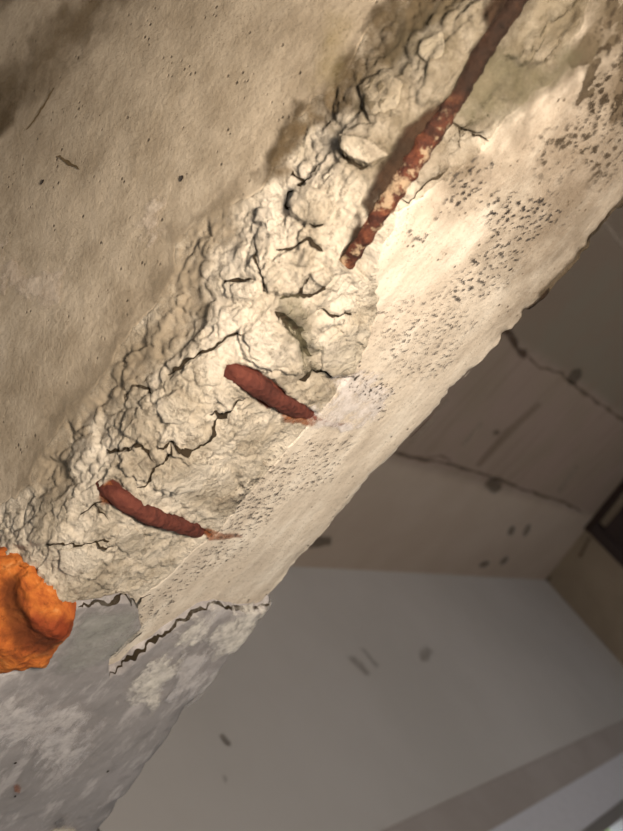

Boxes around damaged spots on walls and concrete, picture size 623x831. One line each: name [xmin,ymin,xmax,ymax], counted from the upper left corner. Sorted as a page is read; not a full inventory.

water stain [266,0,491,182]
corrosion [342,100,446,257]
corrosion [472,0,507,52]
water stain [462,0,620,130]
water stain [537,53,623,181]
crack [168,332,243,375]
crack [224,223,352,382]
spalling [0,0,589,673]
water stain [375,159,562,377]
crack [106,397,247,488]
corrosion [201,528,240,540]
crack [110,597,270,674]